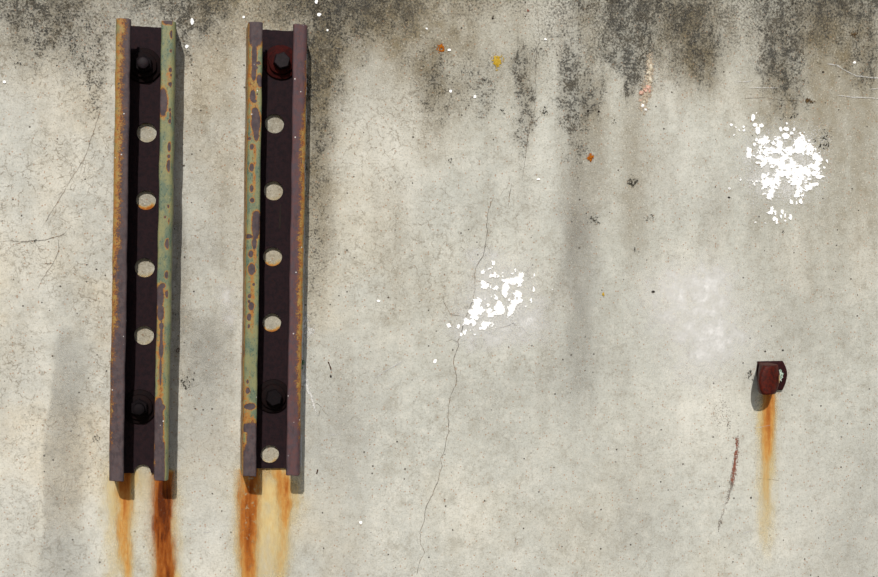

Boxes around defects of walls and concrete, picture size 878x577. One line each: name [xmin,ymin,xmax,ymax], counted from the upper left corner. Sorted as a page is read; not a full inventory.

damp [0,0,111,113]
damp [121,0,230,63]
damp [249,0,424,297]
damp [510,44,544,155]
damp [553,0,724,168]
peeling [729,112,828,224]
damp [754,0,878,120]
peeling [446,261,535,336]
rust [757,394,775,503]
rust [107,470,139,577]
rust [152,469,180,577]
rust [237,459,298,577]